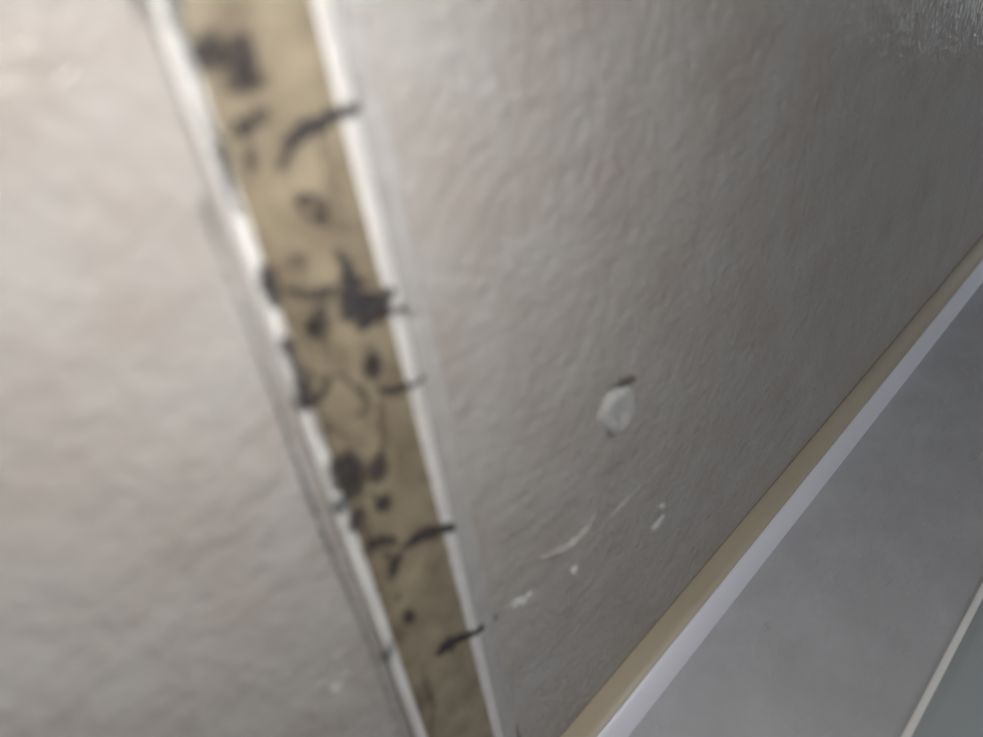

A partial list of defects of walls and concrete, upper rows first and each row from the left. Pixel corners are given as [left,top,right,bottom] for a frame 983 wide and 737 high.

leakage [205,110,265,210]
leakage [281,101,361,168]
leakage [286,250,418,342]
leakage [281,337,369,417]
leakage [365,354,381,378]
leakage [330,376,455,580]
leakage [436,625,485,656]